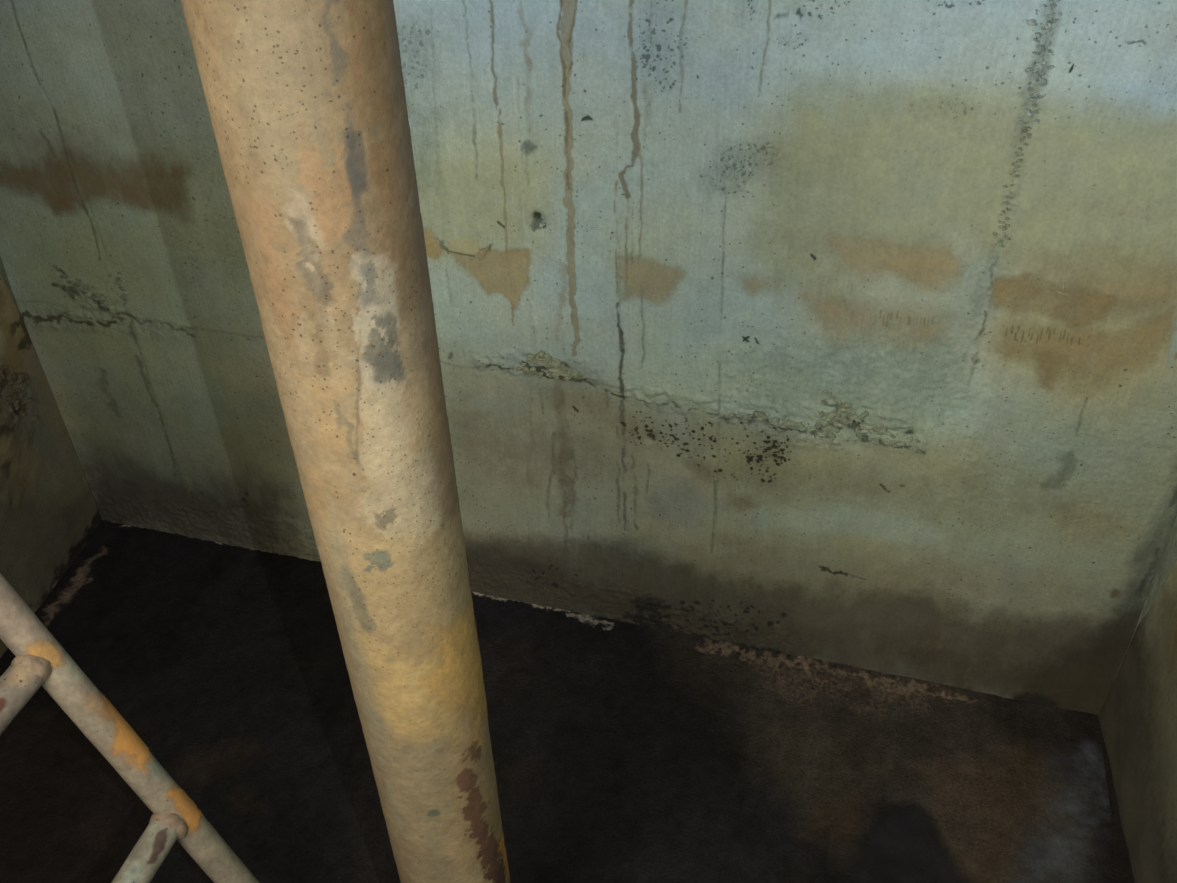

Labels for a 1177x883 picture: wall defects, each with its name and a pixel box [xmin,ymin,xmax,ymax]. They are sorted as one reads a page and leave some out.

corrosion [557,0,580,355]
crack [21,306,184,330]
damp [617,303,625,433]
crack [584,380,677,407]
corrosion [433,612,510,883]
damp [465,521,1175,883]